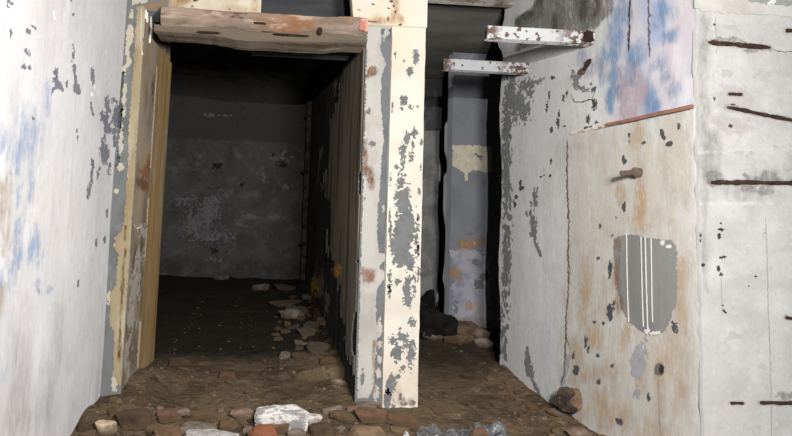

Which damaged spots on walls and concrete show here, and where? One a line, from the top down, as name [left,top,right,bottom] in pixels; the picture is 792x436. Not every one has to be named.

peeling [51,0,149,392]
peeling [149,67,157,168]
peeling [449,74,555,368]
peeling [550,69,599,133]
peeling [524,346,541,396]
peeling [593,234,679,402]